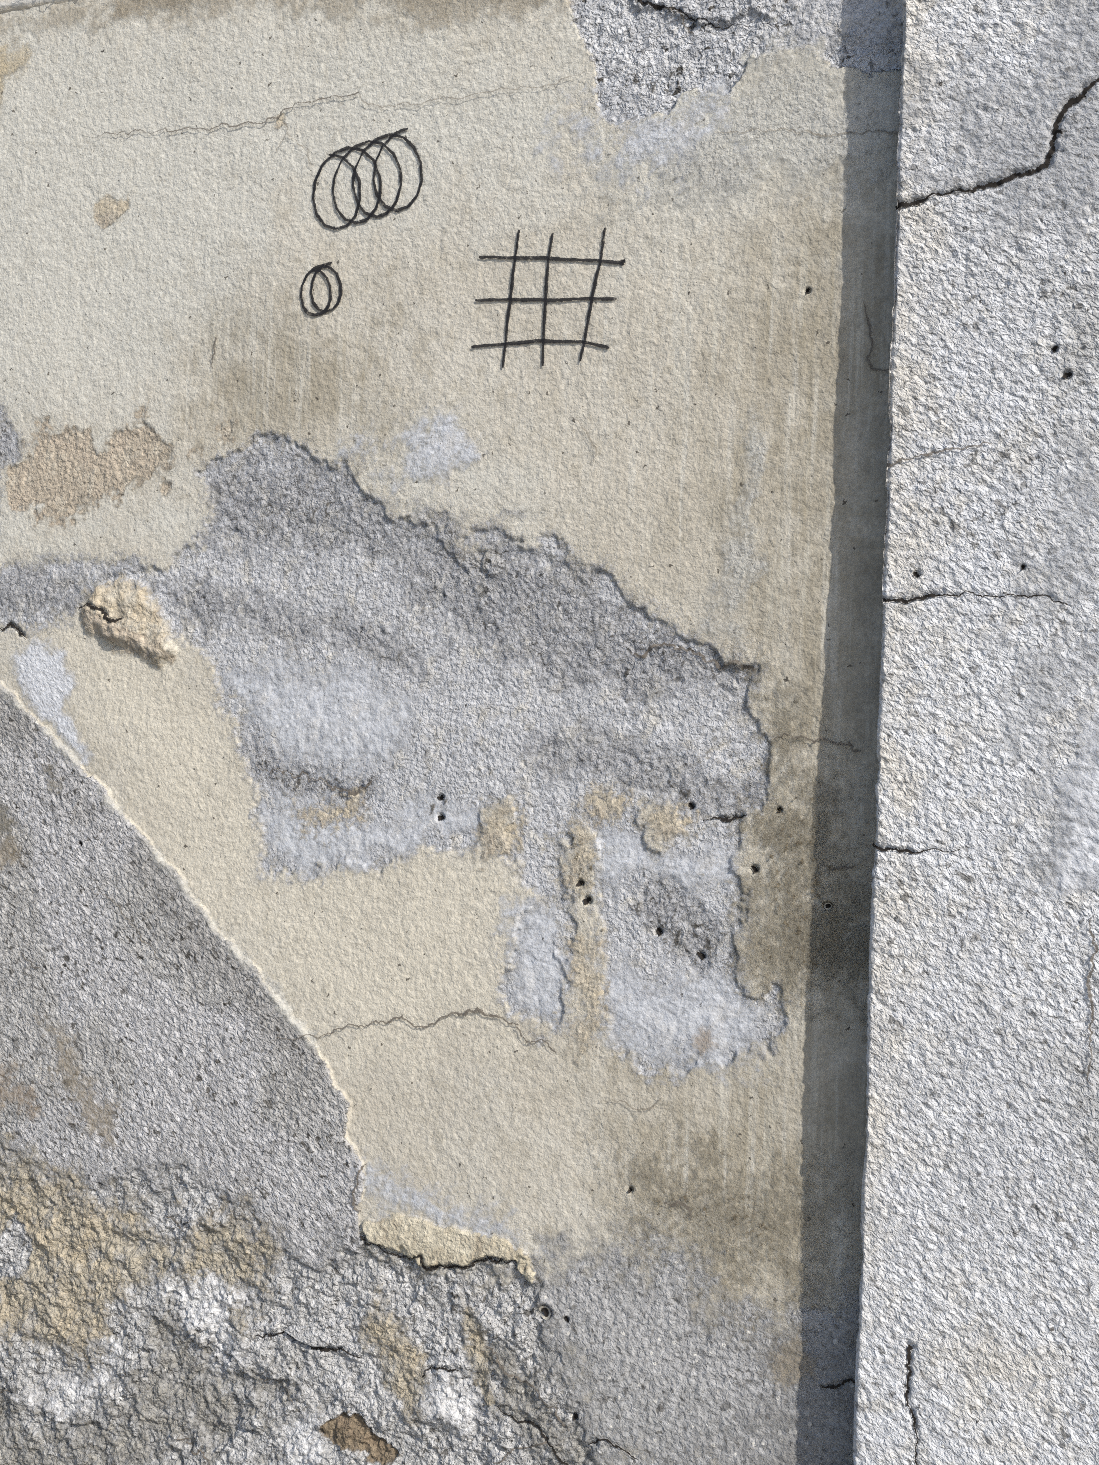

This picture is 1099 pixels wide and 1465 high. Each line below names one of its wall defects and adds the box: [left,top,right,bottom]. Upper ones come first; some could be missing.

flaking render [537,0,904,198]
crack [895,78,1099,210]
crack [882,591,1068,605]
peeling [0,401,793,1086]
leakage [292,787,369,847]
leakage [471,795,525,871]
leakage [558,783,700,896]
leakage [758,733,855,974]
crack [276,1007,556,1053]
leakage [554,928,610,1064]
crack [905,1345,919,1465]